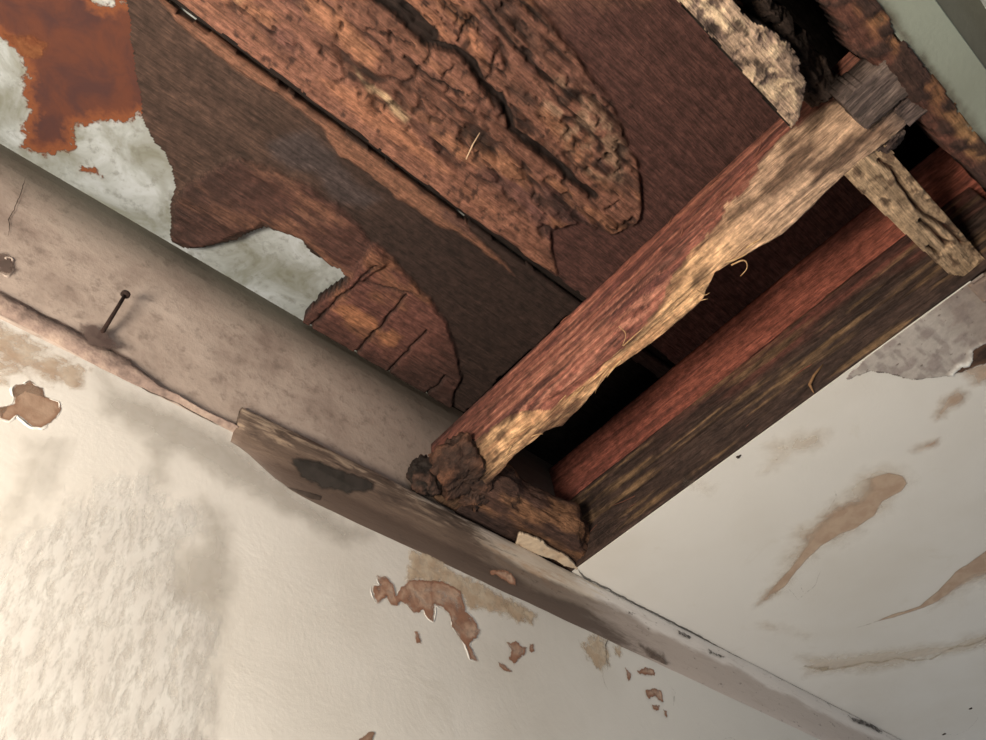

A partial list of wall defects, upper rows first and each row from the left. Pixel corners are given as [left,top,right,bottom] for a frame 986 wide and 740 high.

rust [0,0,143,156]
spalling [0,253,15,278]
peeling [846,273,986,380]
damp [968,365,986,380]
peeling [0,380,61,430]
damp [292,458,373,493]
peeling [515,531,578,570]
damp [766,473,906,599]
damp [881,552,986,620]
peeling [370,575,480,662]
peeling [499,641,534,672]
peeling [646,688,667,717]